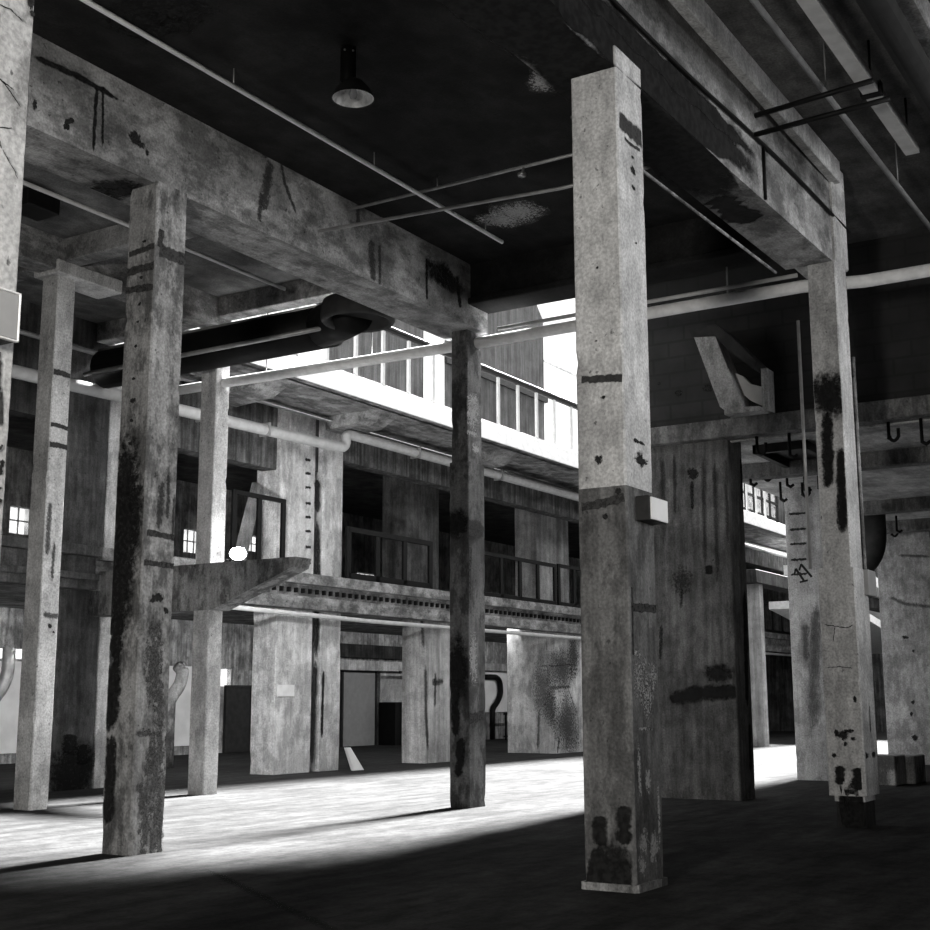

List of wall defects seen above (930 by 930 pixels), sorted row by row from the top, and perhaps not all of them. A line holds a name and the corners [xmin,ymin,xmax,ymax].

damp [813,372,847,533]
damp [669,664,736,705]